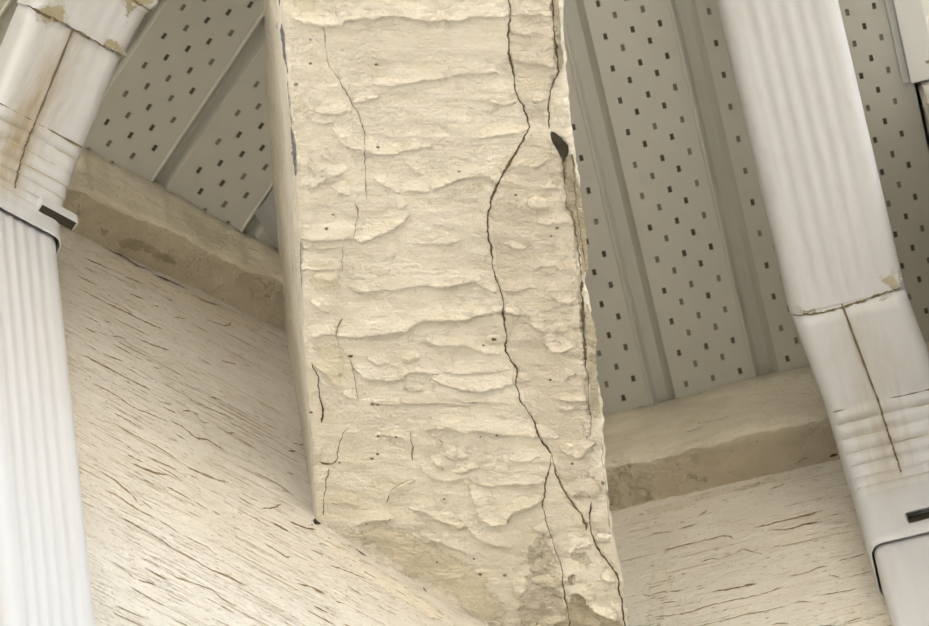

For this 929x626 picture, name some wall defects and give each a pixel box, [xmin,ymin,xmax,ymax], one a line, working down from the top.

crack [323,28,367,270]
spalling [550,131,588,275]
crack [486,0,626,626]
crack [311,362,324,423]
crack [336,318,358,398]
crack [319,428,348,515]
spalling [518,537,623,626]
crack [665,535,732,550]
crack [653,587,788,626]
crack [754,510,823,530]